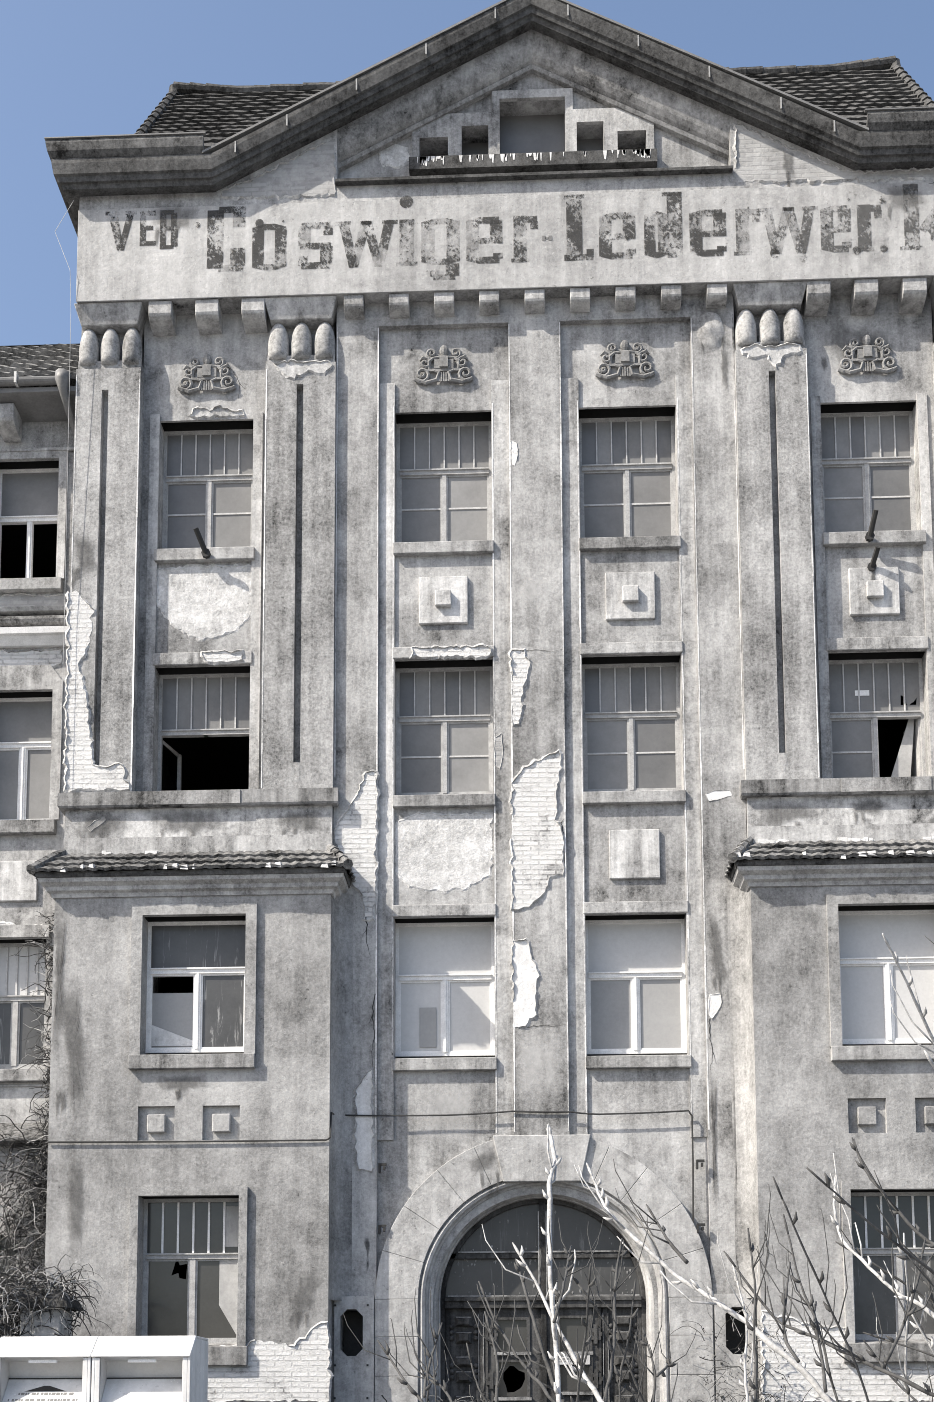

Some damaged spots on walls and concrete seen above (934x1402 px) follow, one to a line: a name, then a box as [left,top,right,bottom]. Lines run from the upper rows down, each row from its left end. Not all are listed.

peeling [0,590,132,793]
flaking render [333,643,566,922]
peeling [510,937,541,1028]
peeling [352,1067,376,1173]
peeling [208,1321,334,1402]
peeling [760,1310,934,1402]